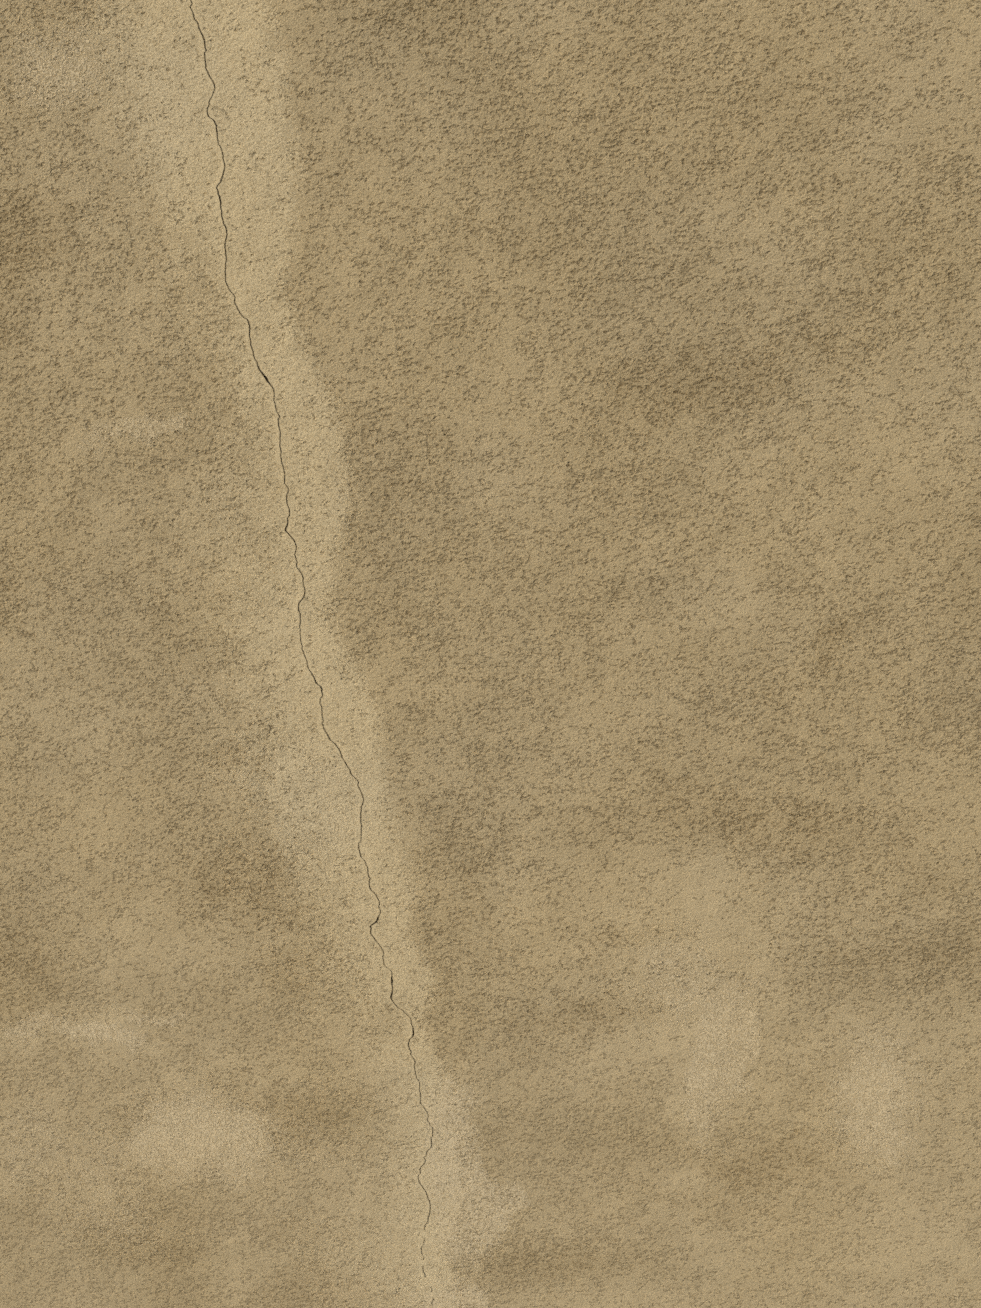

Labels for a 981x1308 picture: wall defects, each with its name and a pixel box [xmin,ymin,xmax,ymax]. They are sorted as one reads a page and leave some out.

crack [190,0,434,1304]